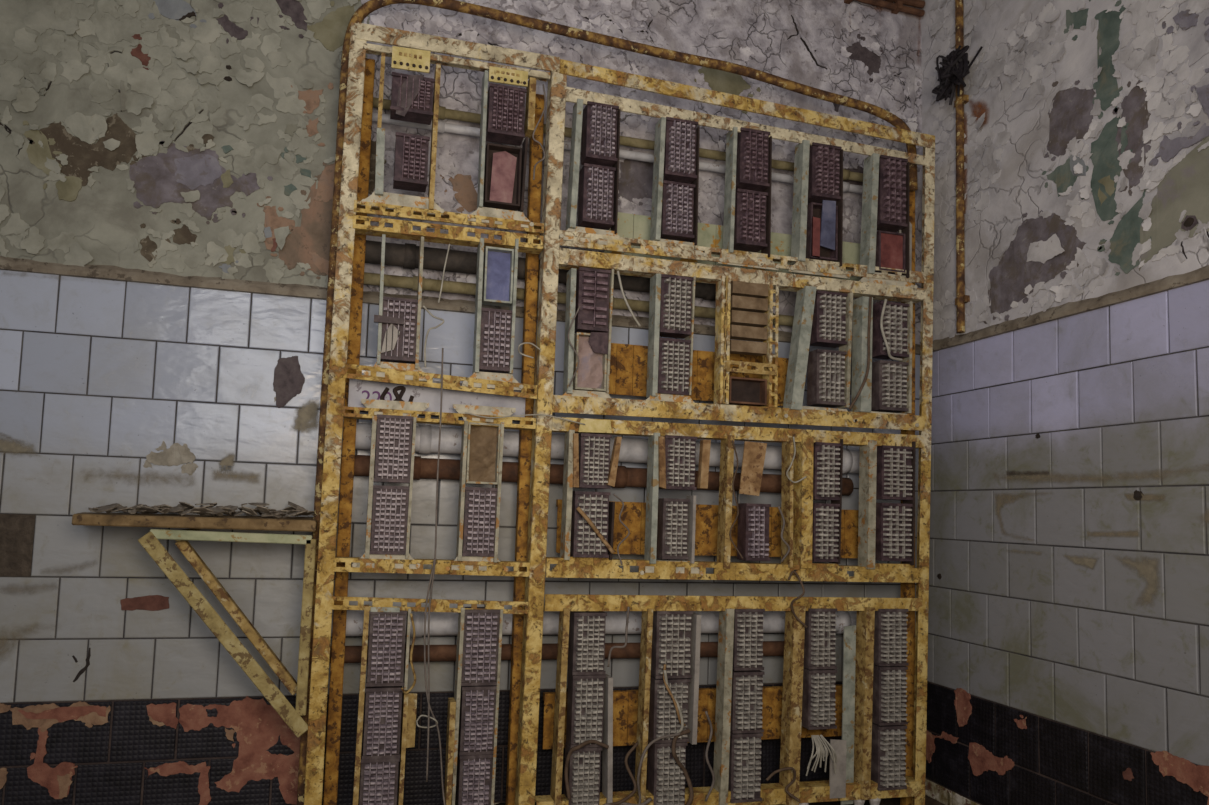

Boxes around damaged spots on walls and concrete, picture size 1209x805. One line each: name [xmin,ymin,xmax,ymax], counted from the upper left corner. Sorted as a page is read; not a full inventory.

peeling [0,0,674,283]
peeling [694,0,1209,338]
peeling [364,263,476,290]
spalling [273,356,305,408]
peeling [0,514,35,577]
spalling [120,595,169,611]
crack [72,648,91,682]
spalling [0,701,111,799]
spalling [144,696,301,805]
spalling [926,688,1015,776]
spalling [1014,715,1027,729]
spalling [1151,751,1209,805]